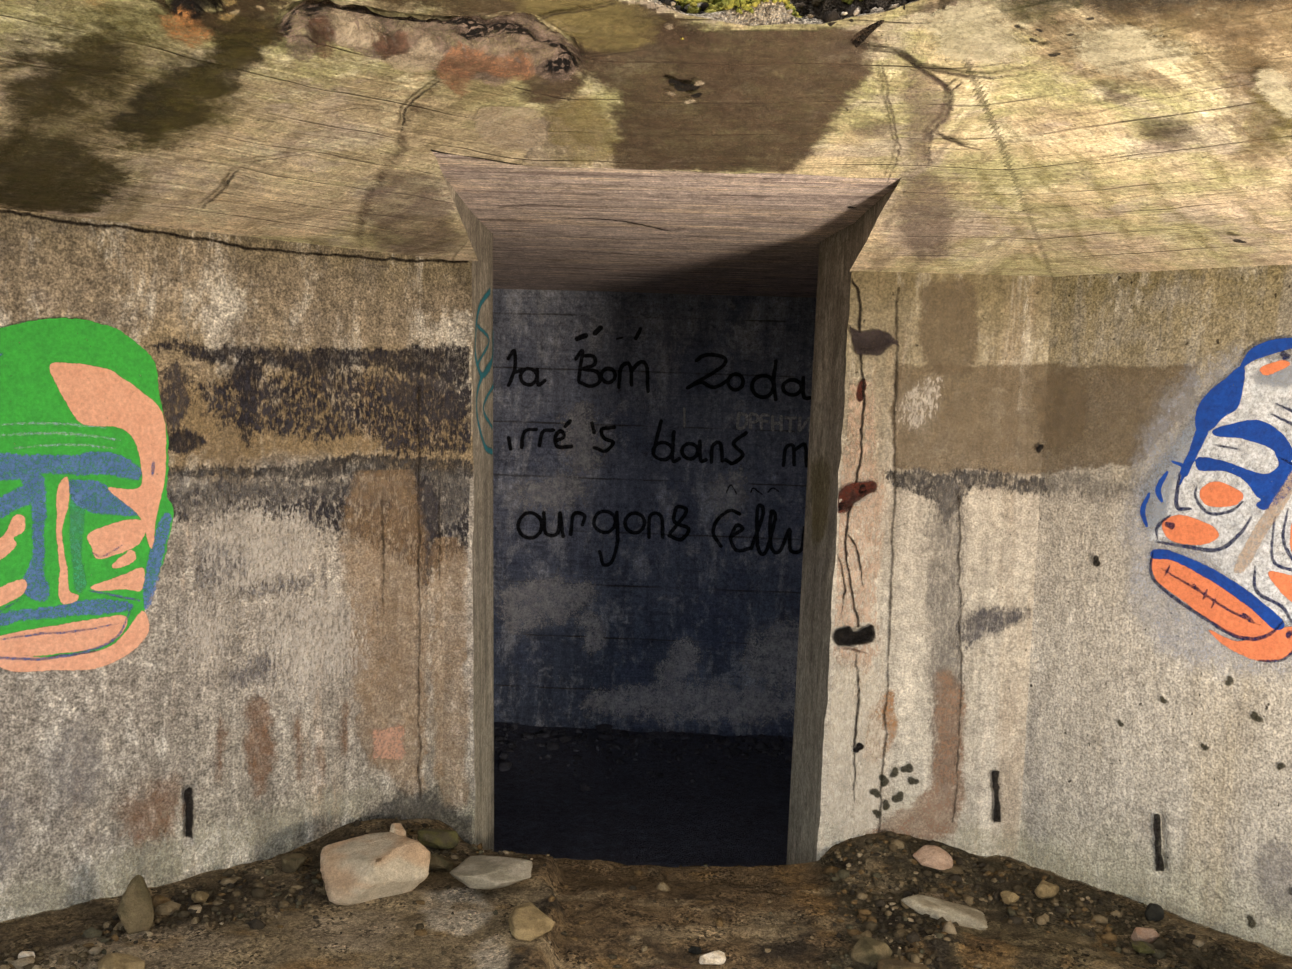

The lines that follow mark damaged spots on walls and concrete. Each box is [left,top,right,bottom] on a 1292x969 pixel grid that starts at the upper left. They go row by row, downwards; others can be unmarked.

leakage [0,27,131,213]
spalling [160,0,235,47]
leakage [118,0,295,148]
crack [537,3,615,21]
leakage [375,0,879,172]
crack [856,44,1036,178]
leakage [911,1,1029,65]
leakage [1058,2,1292,171]